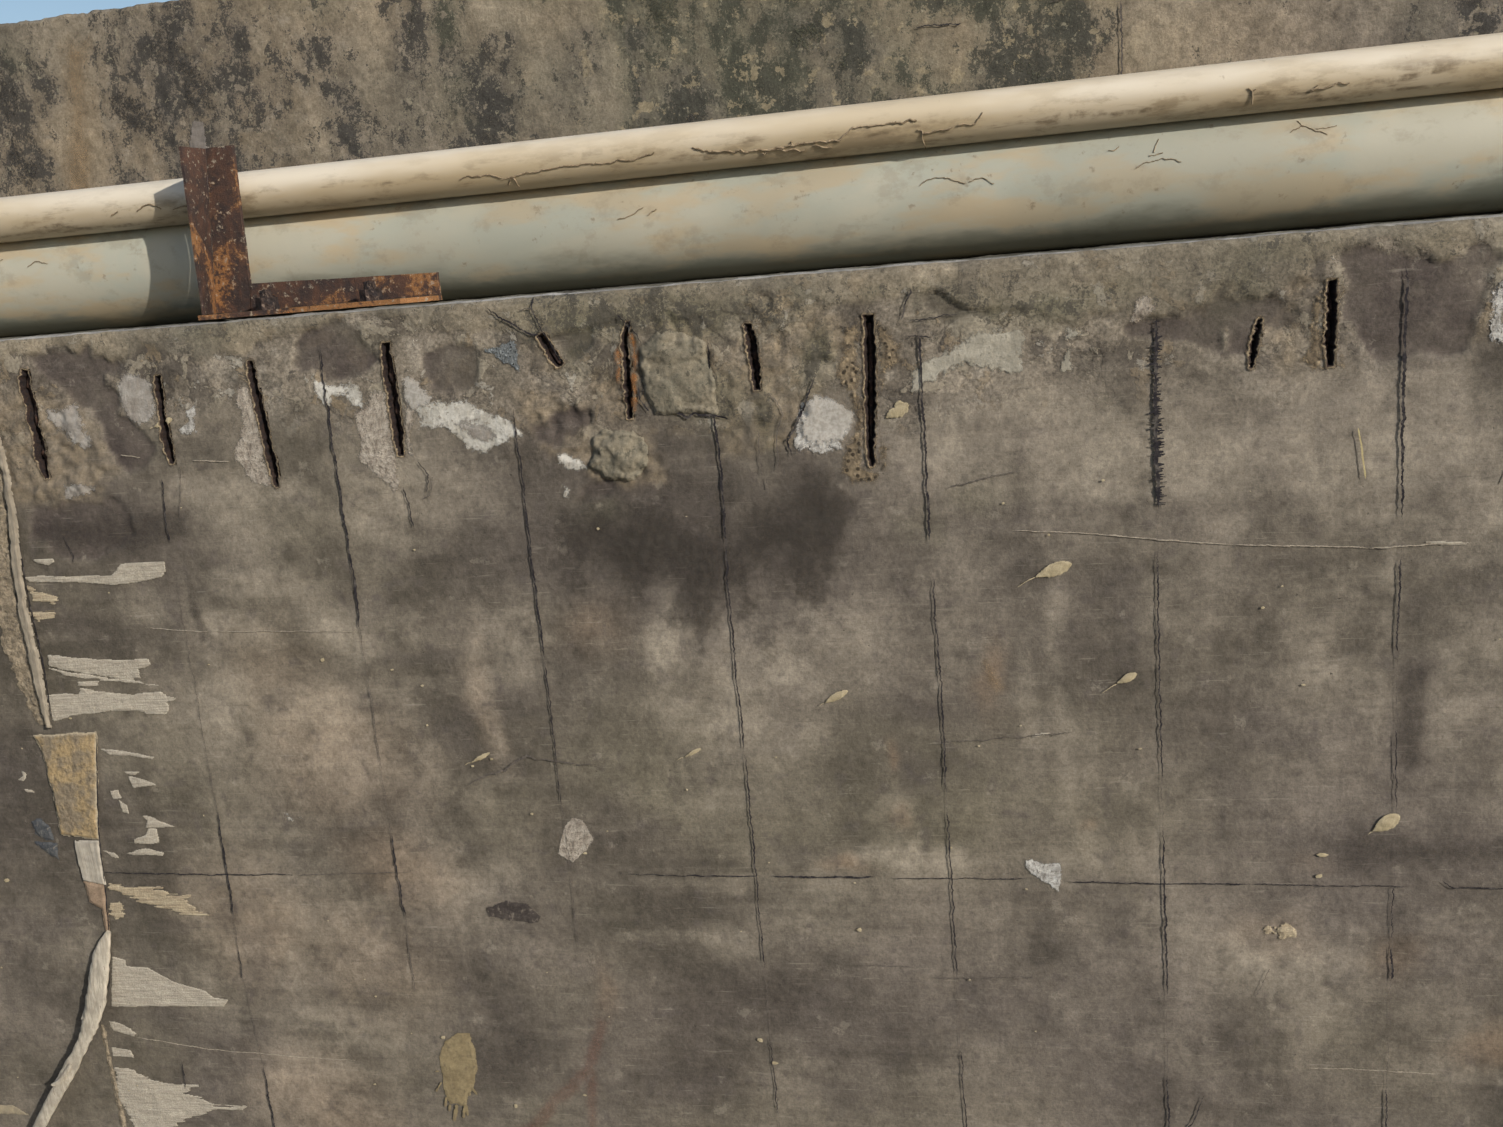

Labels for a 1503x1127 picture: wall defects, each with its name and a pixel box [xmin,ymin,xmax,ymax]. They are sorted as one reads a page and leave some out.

leakage [108,83,166,141]
leakage [151,23,222,139]
peeling [47,404,92,449]
peeling [118,373,156,425]
spalling [234,387,279,487]
spalling [354,390,418,492]
spalling [794,325,889,483]
peeling [877,323,1026,392]
spalling [0,468,46,725]
crack [635,289,1069,1127]
crack [1066,266,1410,1127]
crack [1443,881,1503,890]